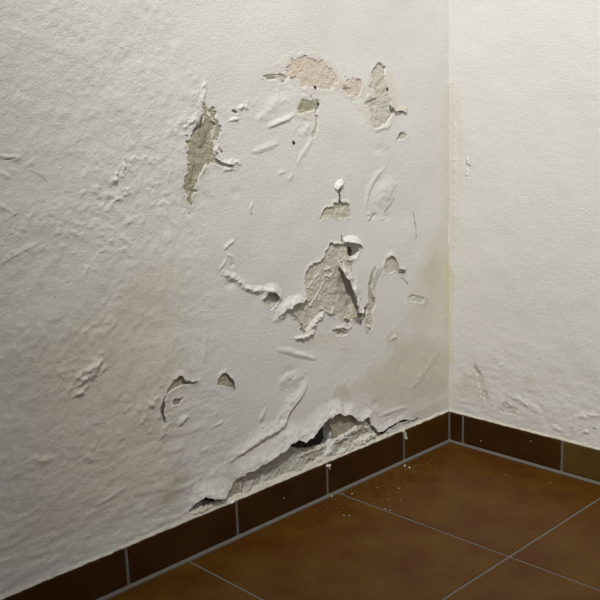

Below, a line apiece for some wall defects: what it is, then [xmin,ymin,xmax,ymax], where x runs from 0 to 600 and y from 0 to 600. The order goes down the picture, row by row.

peeling [263,56,408,129]
peeling [183,104,236,205]
peeling [318,179,352,224]
peeling [260,235,407,336]
peeling [160,374,199,417]
peeling [215,367,237,392]
peeling [184,399,410,515]